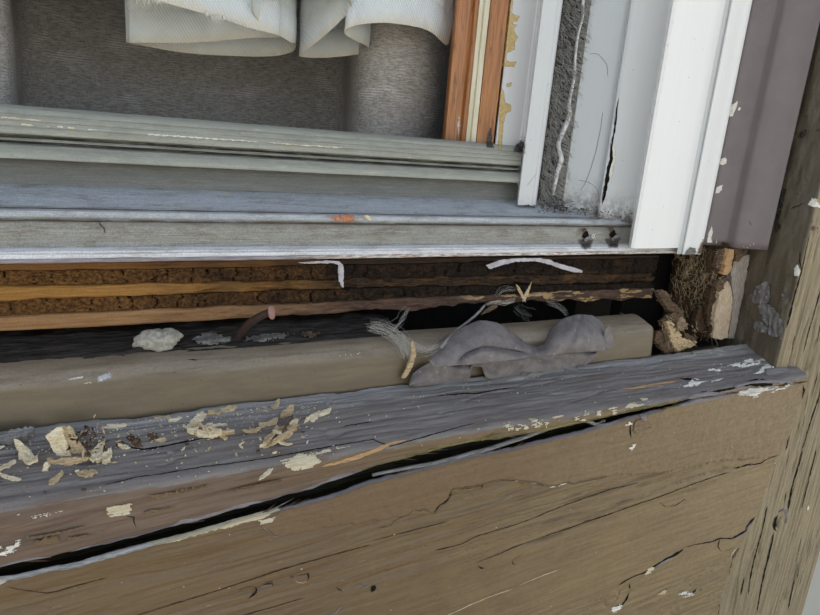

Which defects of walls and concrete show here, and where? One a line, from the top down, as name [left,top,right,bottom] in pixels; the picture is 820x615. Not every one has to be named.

crack [787,234,820,352]
peeling [672,358,788,406]
peeling [504,415,564,431]
peeling [574,398,651,450]
peeling [280,446,350,471]
peeling [106,503,132,517]
crack [0,374,820,615]